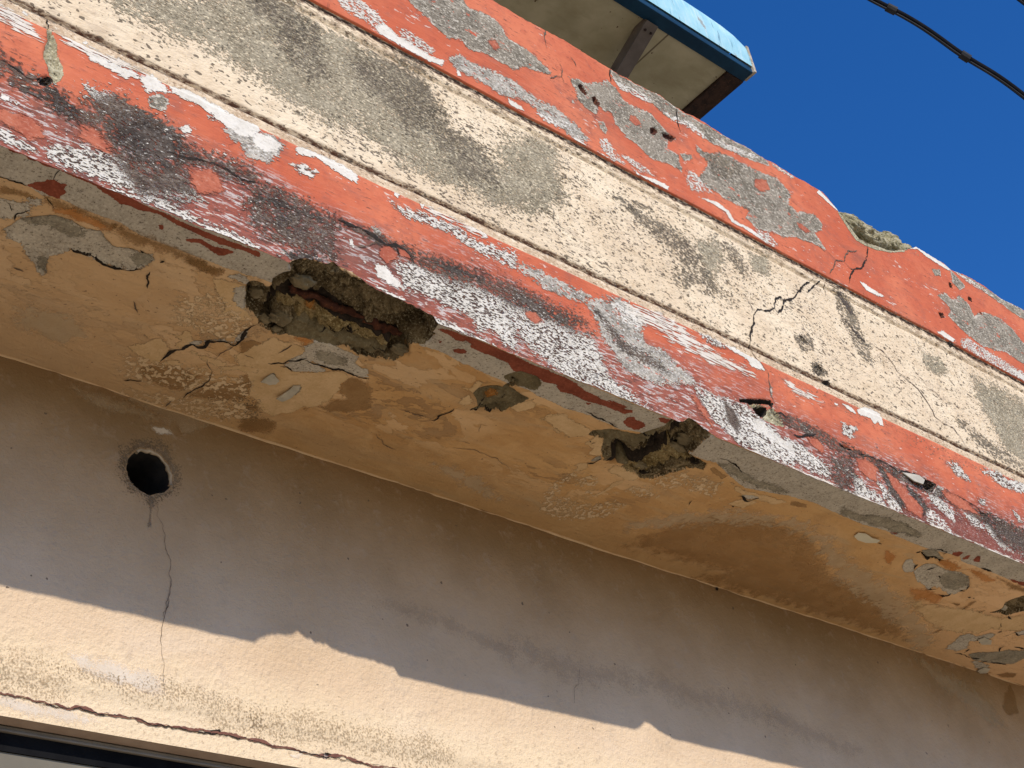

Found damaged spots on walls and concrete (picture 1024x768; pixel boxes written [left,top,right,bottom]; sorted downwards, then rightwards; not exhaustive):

peeling [0,0,1024,597]
crack [743,239,868,349]
crack [160,325,367,407]
leakage [627,510,931,651]
flaking render [946,596,1024,674]
crack [0,692,396,768]